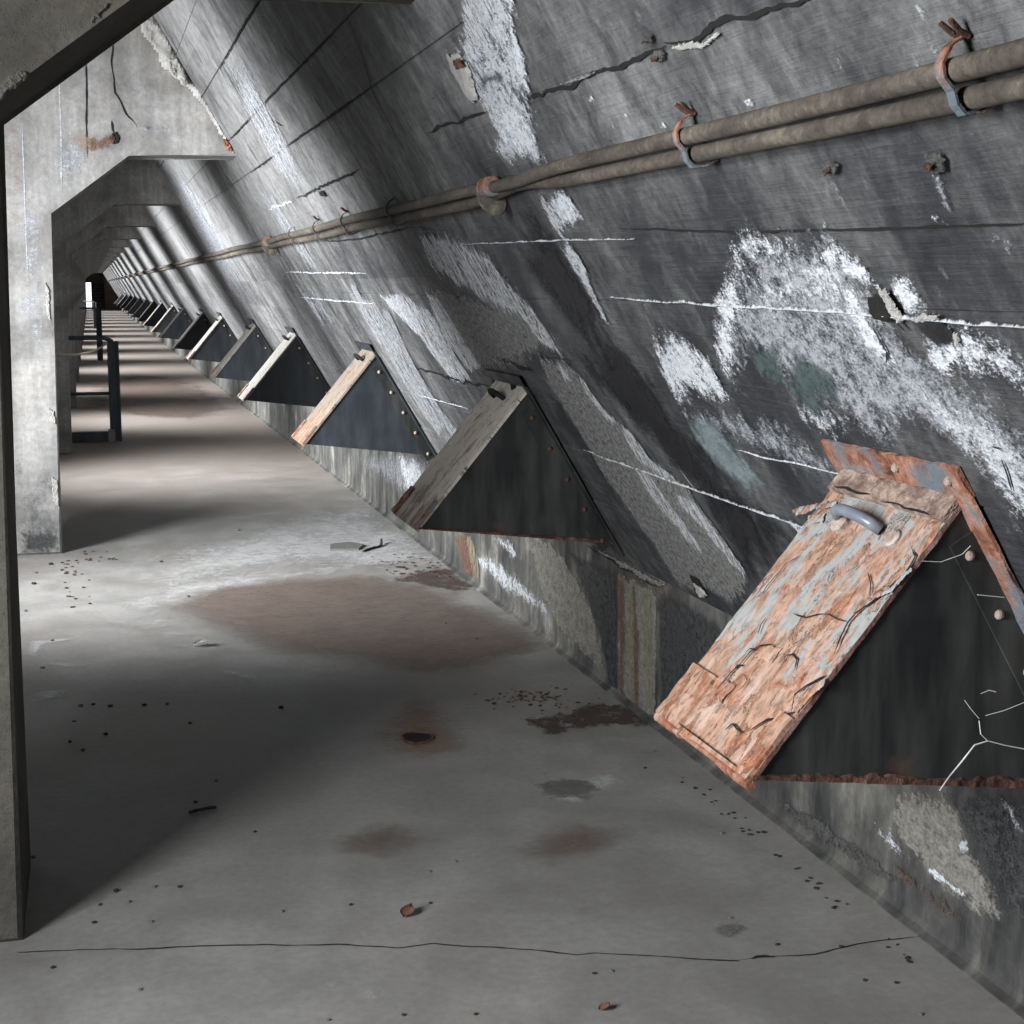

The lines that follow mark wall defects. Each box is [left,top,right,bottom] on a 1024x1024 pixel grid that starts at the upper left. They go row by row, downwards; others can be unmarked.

corrosion [79,136,110,150]
crack [85,45,137,158]
spalling [141,16,234,153]
crack [228,4,412,199]
spalling [446,53,479,103]
crack [520,0,808,102]
peeling [867,288,963,347]
leakage [524,191,1024,573]
leakage [172,509,527,668]
leakage [479,557,555,619]
corrosion [752,773,1024,789]
crack [19,936,919,961]